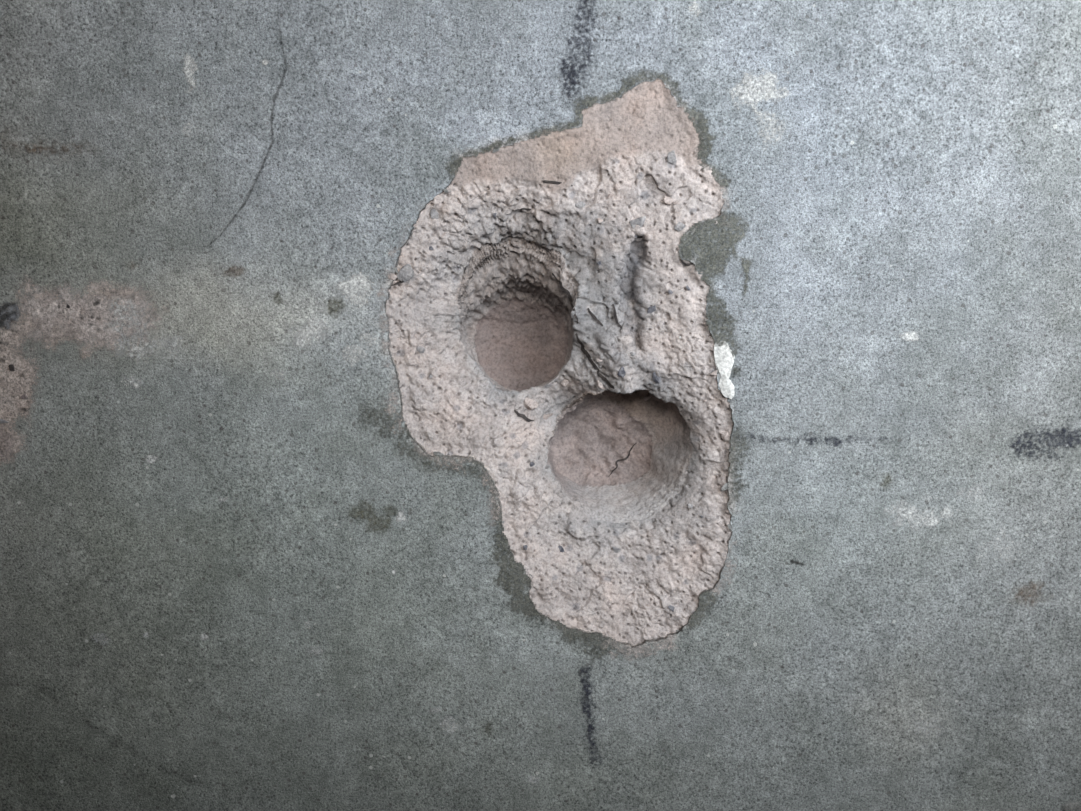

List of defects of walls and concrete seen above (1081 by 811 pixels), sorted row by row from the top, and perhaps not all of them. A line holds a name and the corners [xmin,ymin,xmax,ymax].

peeling [0,282,182,462]
spalling [378,78,735,660]